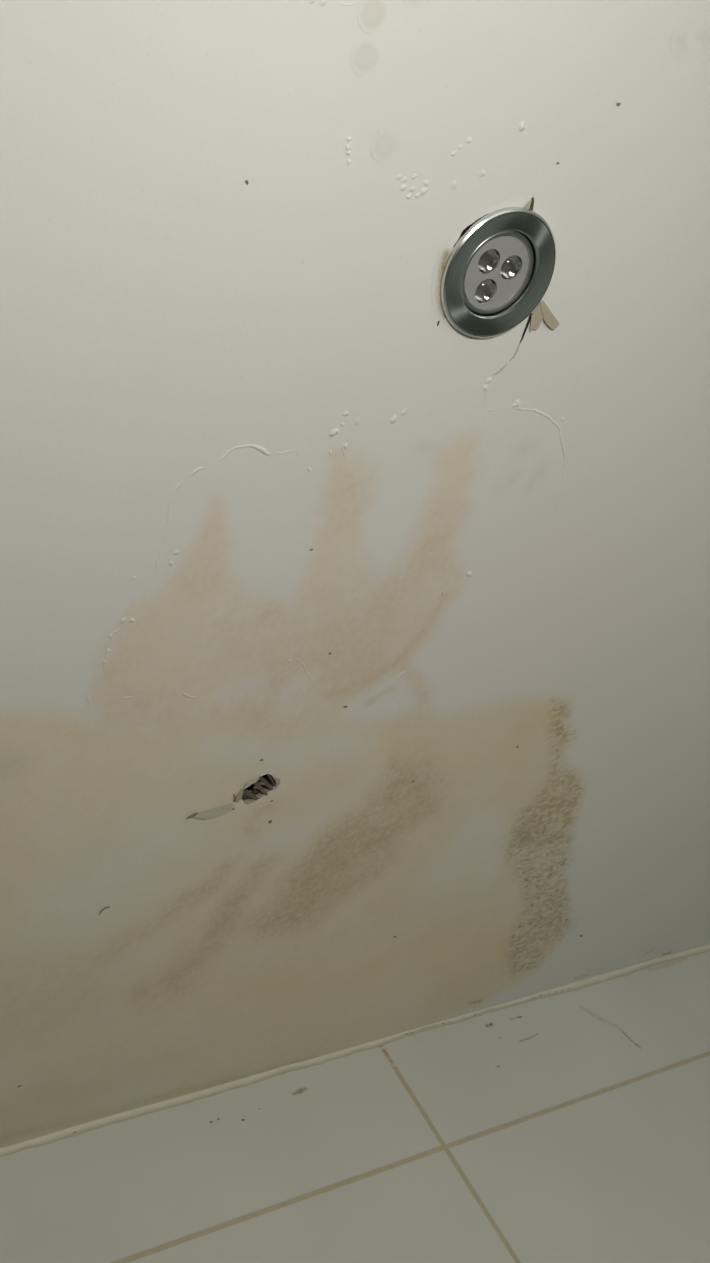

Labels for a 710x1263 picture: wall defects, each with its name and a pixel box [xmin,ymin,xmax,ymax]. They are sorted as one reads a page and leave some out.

crack [493,313,533,375]
spalling [187,774,280,820]
leakage [0,421,591,1148]